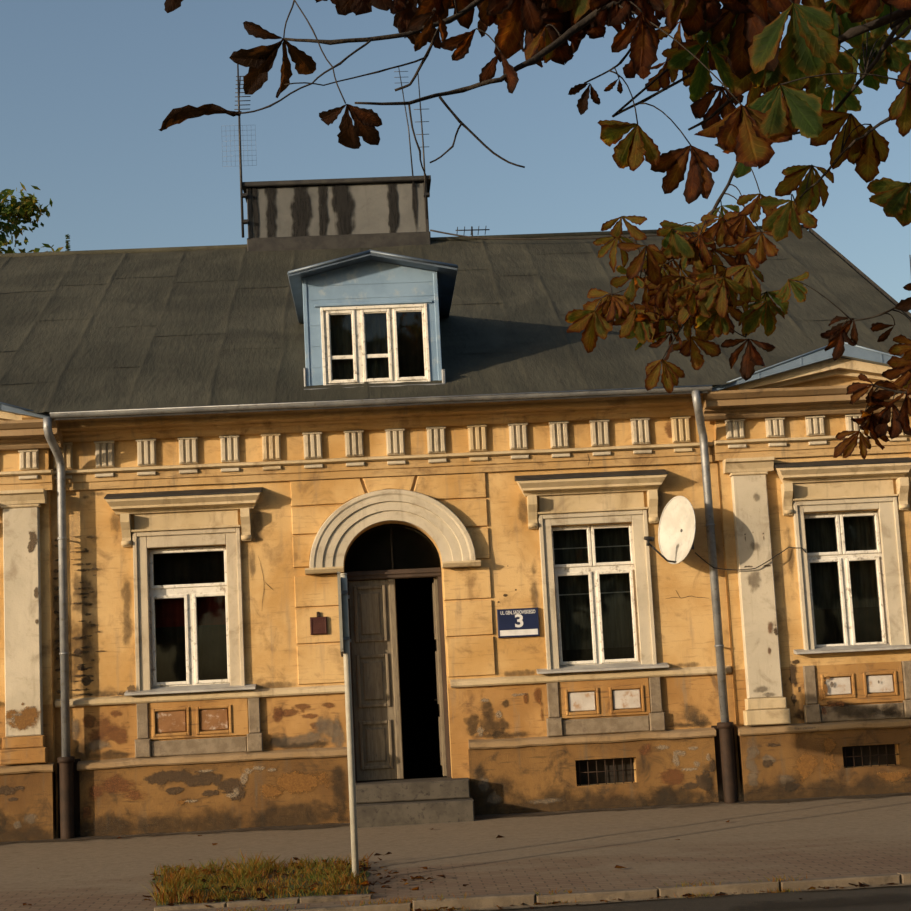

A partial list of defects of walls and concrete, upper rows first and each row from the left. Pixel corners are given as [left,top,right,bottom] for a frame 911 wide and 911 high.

peeling [5,703,41,730]
flaking render [83,711,126,744]
flaking render [273,704,318,728]
spalling [144,766,276,802]